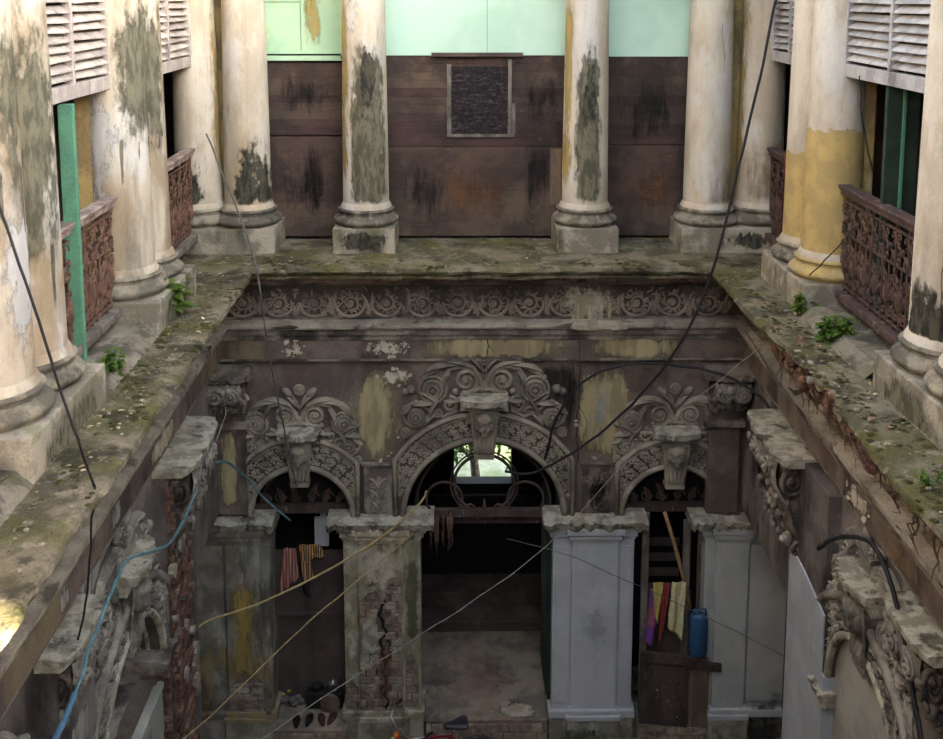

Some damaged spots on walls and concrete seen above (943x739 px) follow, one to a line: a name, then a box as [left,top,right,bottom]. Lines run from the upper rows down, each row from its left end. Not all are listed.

leakage [306,0,320,40]
flaking render [354,340,412,463]
flaking render [346,549,419,712]
crack [375,600,392,711]